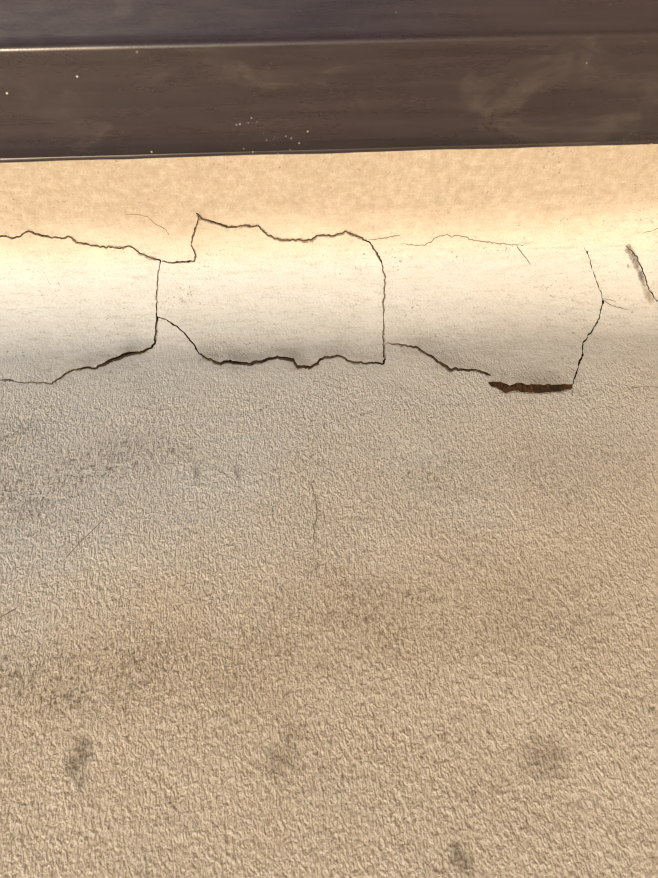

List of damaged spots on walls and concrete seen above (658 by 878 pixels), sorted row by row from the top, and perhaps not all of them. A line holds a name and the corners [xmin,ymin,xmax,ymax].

crack [0,213,530,385]
crack [572,248,628,396]
crack [626,228,658,302]